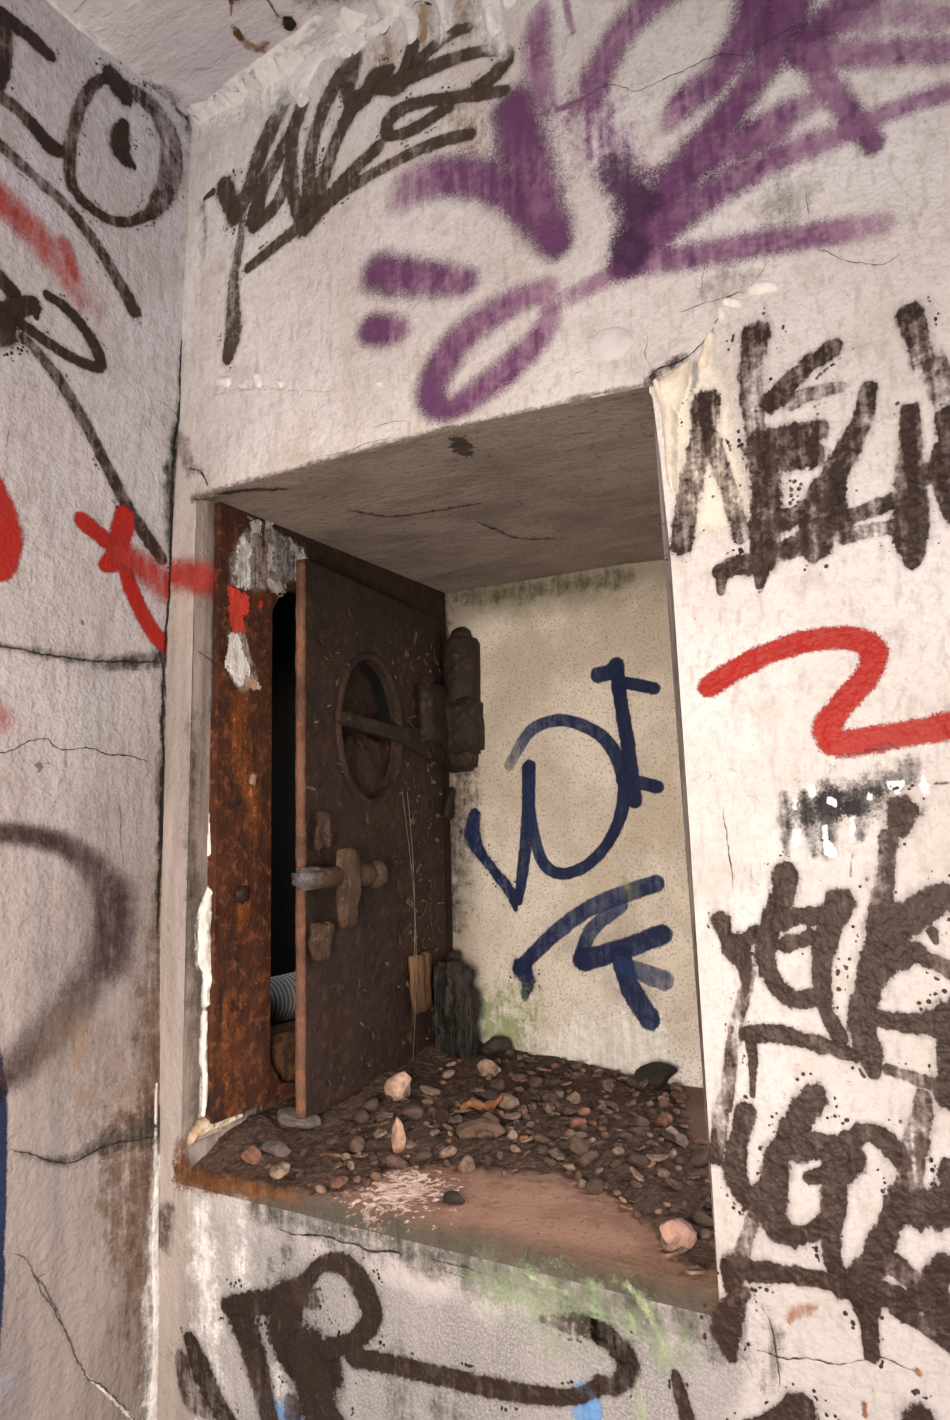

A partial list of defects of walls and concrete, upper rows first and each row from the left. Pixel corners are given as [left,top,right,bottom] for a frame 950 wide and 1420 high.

crack [0,340,182,933]
peeling [225,632,261,691]
peeling [232,517,307,597]
corrosion [231,689,256,847]
water stain [100,922,174,1420]
crack [15,1254,137,1420]
water stain [274,1361,287,1403]
water stain [187,1193,719,1385]